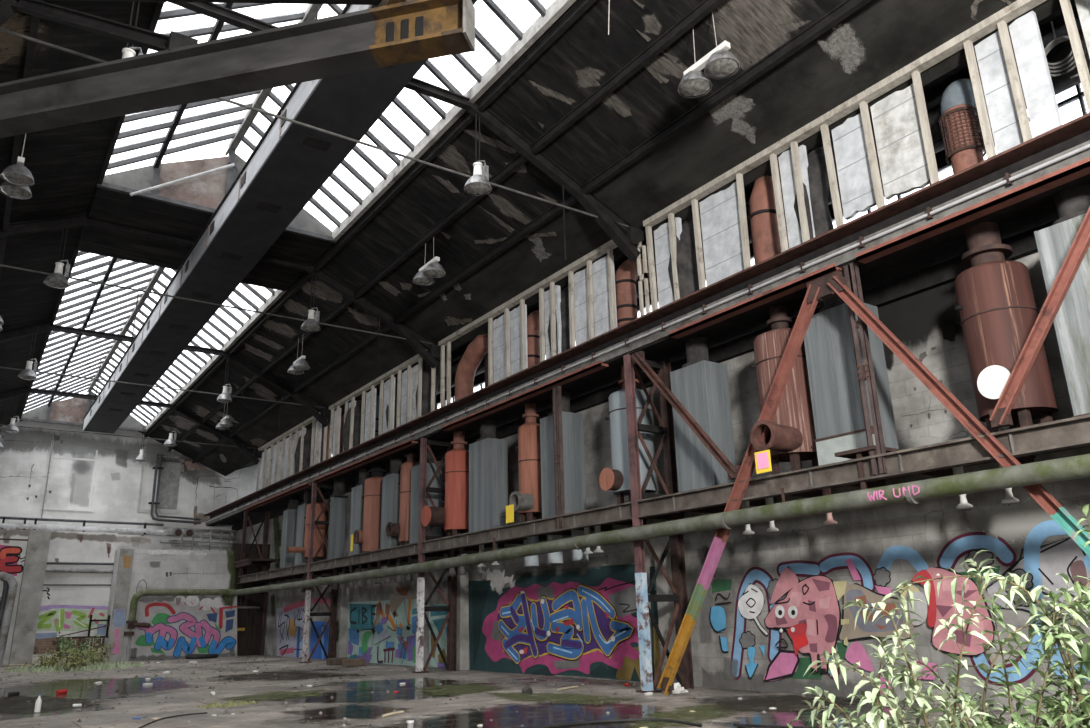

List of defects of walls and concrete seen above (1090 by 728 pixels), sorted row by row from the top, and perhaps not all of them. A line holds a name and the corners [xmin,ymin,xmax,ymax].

peeling [633,0,661,42]
peeling [710,0,809,69]
peeling [817,23,865,74]
peeling [528,80,576,105]
peeling [575,67,633,117]
peeling [708,94,756,144]
peeling [463,129,528,173]
peeling [474,193,557,262]